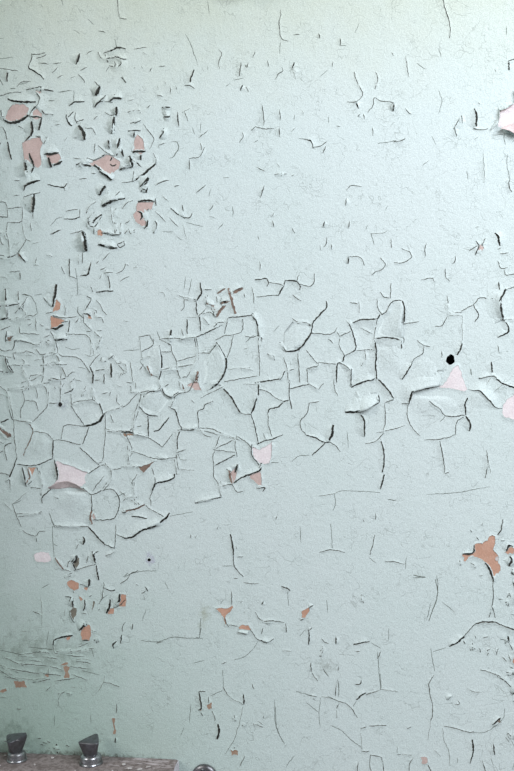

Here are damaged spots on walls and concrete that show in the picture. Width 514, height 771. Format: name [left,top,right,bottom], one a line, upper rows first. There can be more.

crack [215,10,359,154]
peeling [4,103,45,124]
peeling [491,98,514,133]
peeling [19,133,65,171]
crack [0,34,514,631]
peeling [411,362,469,399]
peeling [48,458,90,493]
peeling [225,441,278,487]
peeling [458,531,514,580]
crack [0,621,136,706]
crack [141,619,202,646]
crack [180,519,514,771]